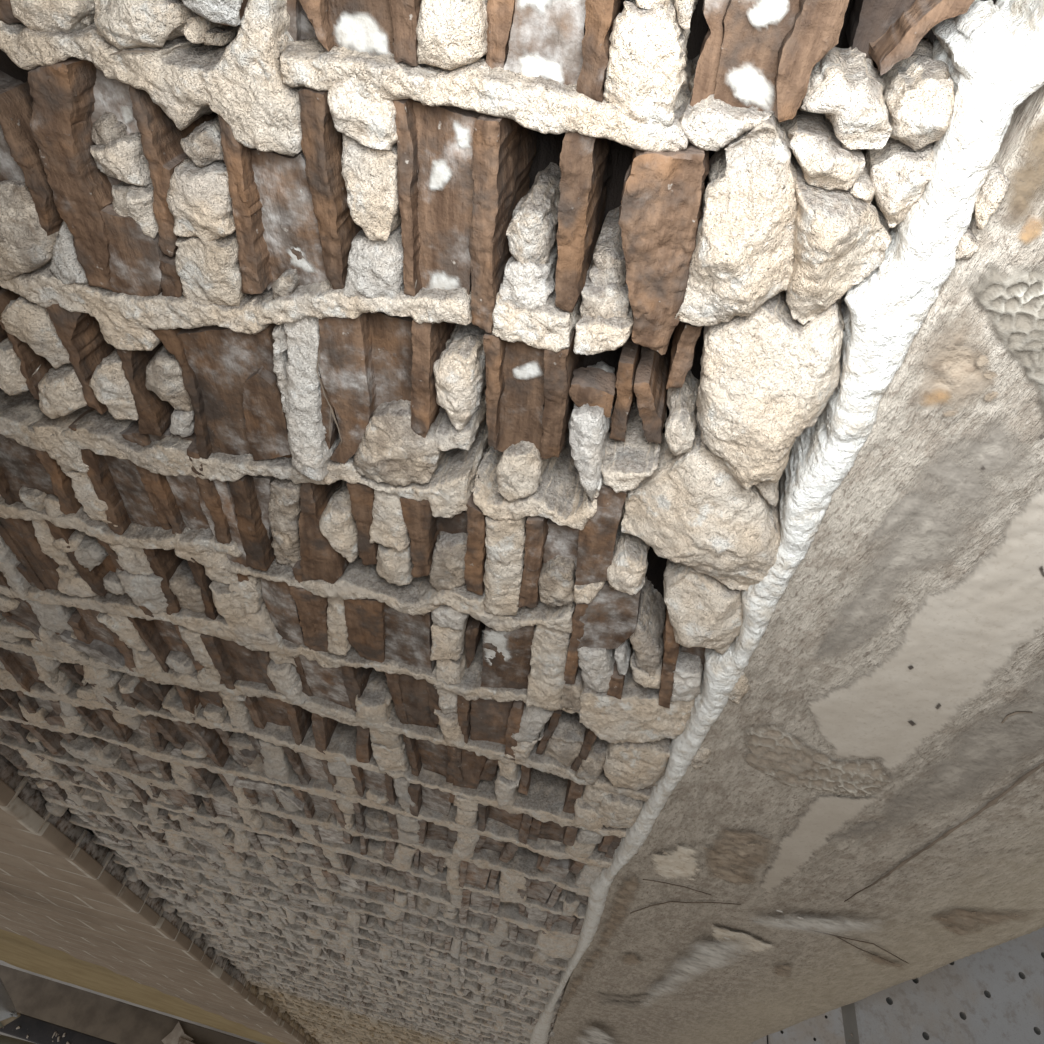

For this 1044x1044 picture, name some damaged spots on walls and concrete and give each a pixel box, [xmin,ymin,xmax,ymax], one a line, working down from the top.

crack [844,762,1044,902]
spalling [651,830,769,884]
crack [630,879,761,922]
peeling [711,926,773,952]
crack [808,929,909,964]